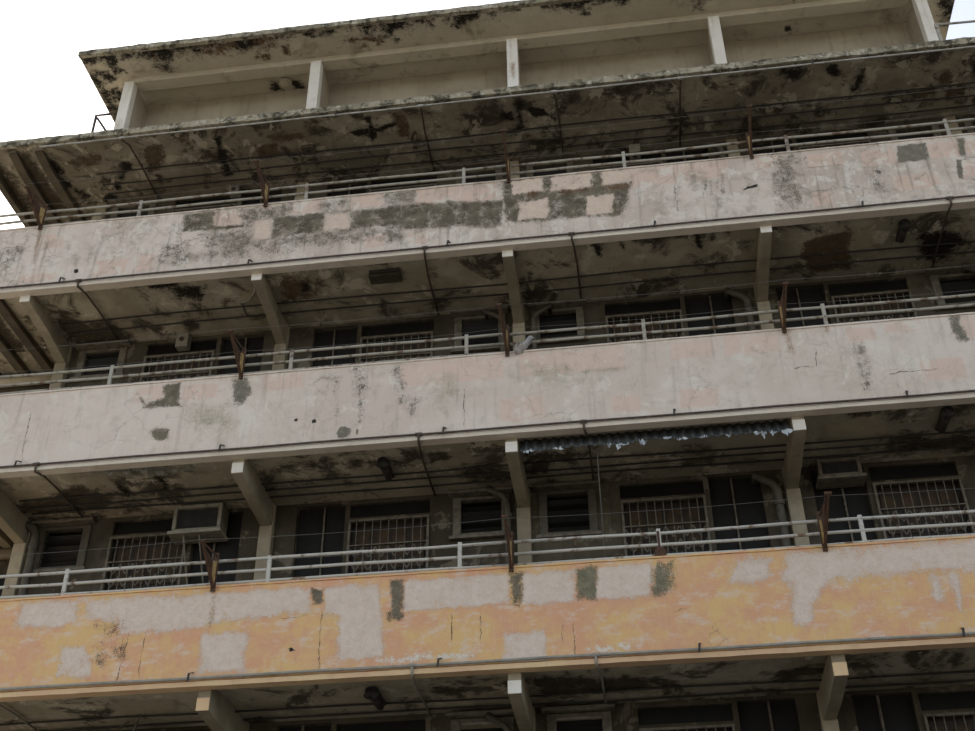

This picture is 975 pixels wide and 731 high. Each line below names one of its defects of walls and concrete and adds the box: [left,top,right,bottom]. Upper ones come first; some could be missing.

leakage [232,8,521,54]
leakage [539,0,630,16]
leakage [930,0,955,33]
leakage [81,43,220,122]
leakage [779,67,804,81]
leakage [824,63,866,93]
leakage [11,151,91,209]
leakage [136,376,253,432]
leakage [384,576,407,622]
leakage [574,564,598,602]
leakage [649,560,678,597]
peeling [777,538,975,631]